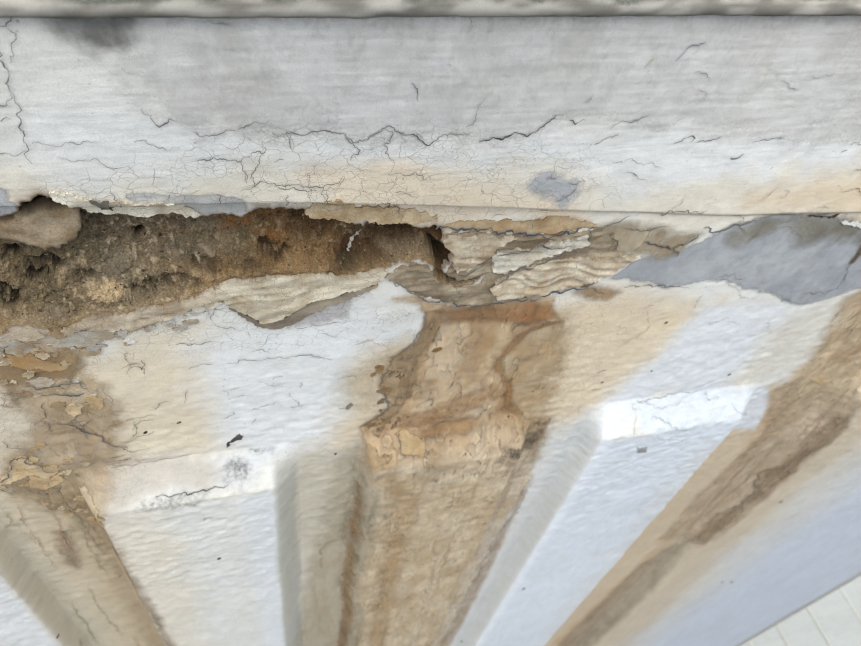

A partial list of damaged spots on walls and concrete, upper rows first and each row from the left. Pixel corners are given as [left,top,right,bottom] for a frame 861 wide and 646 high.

crack [135,94,594,221]
crack [123,353,145,378]
crack [176,308,366,424]
spalling [0,172,861,417]
damp [497,318,565,420]
crack [364,177,804,459]
crack [719,251,861,304]
peeling [0,443,105,527]
crack [0,375,194,646]
crack [156,485,228,498]
crack [709,464,796,521]
damp [666,382,855,543]